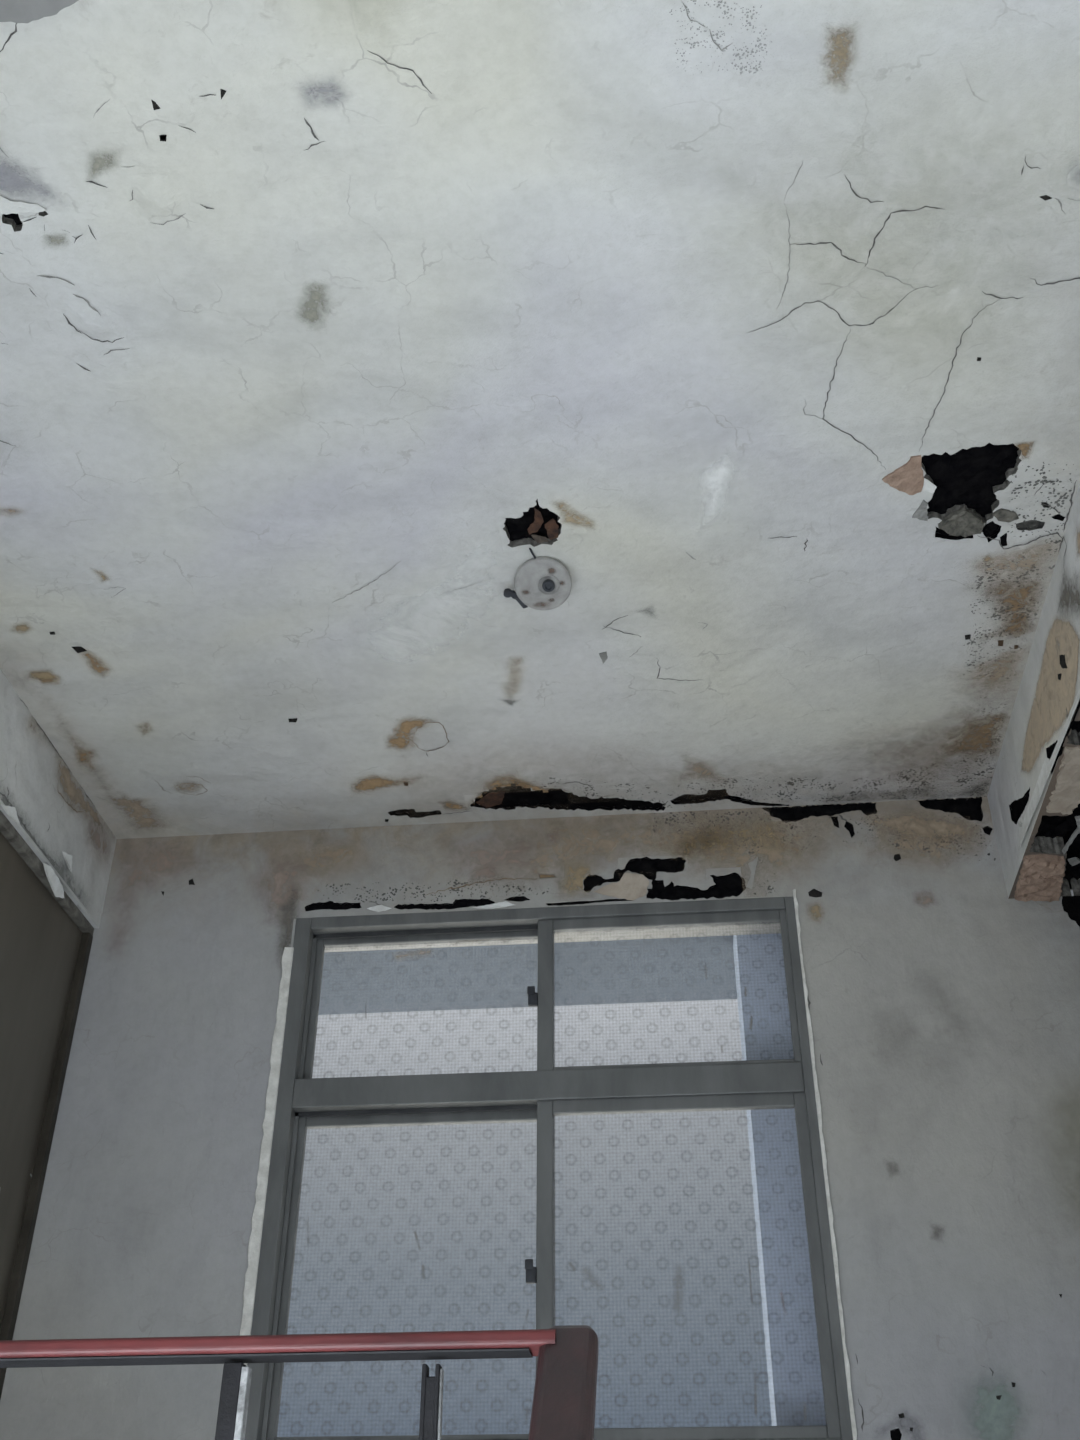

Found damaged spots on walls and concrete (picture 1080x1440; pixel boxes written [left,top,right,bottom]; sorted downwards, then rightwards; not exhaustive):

peeling [0,0,78,52]
crack [748,162,941,469]
crack [919,277,1080,451]
spalling [503,499,591,548]
spalling [882,443,1065,553]
crack [1064,480,1077,530]
water stain [541,459,1080,896]
spalling [385,781,877,838]
water stain [315,879,549,903]
spalling [1062,896,1080,927]
spalling [890,1413,920,1440]